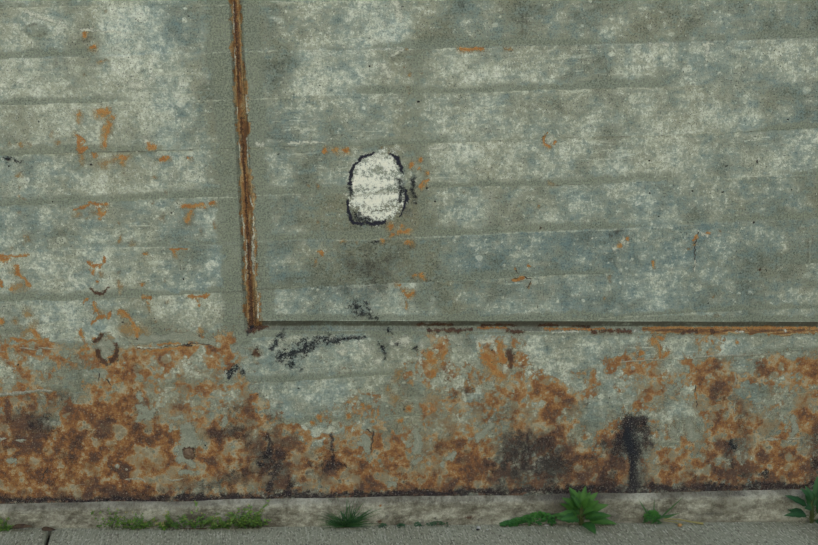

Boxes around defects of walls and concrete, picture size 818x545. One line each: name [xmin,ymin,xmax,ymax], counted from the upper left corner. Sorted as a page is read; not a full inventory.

rust [74,107,130,168]
rust [143,136,170,162]
rust [181,201,217,223]
rust [228,0,269,334]
rust [0,255,818,504]
water stain [0,414,815,504]